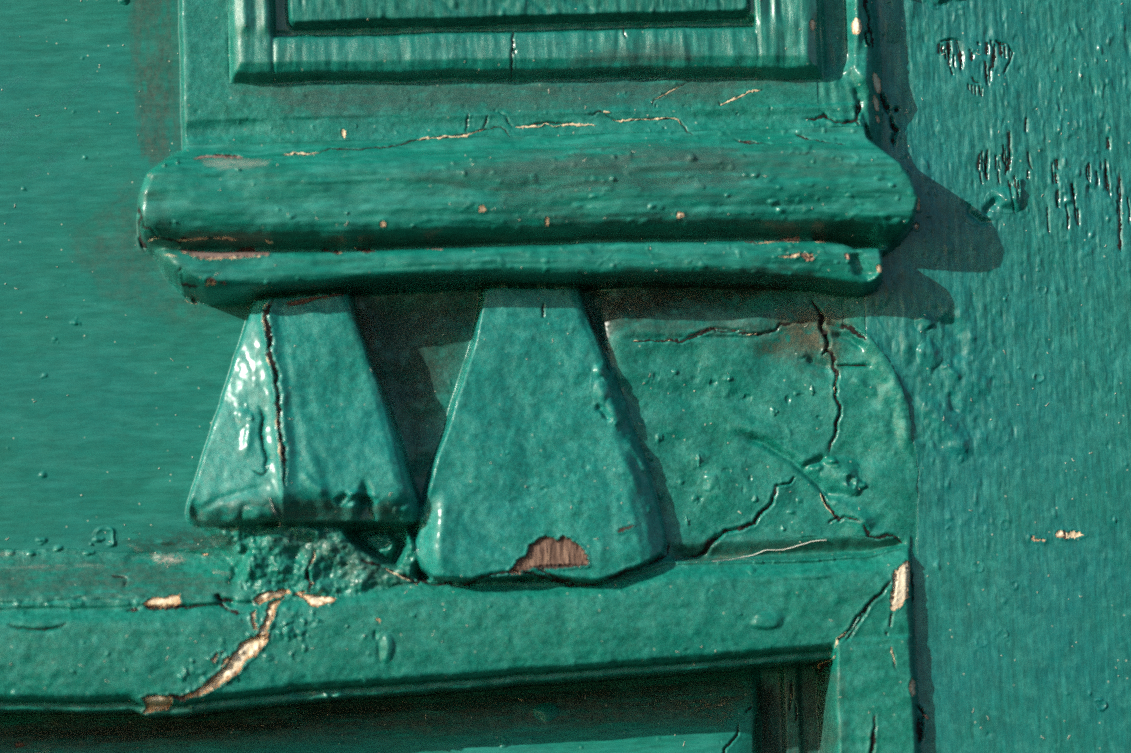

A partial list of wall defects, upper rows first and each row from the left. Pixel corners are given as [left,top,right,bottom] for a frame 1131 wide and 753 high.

crack [281,81,692,156]
crack [719,89,762,106]
crack [938,39,1013,97]
crack [977,119,1130,250]
crack [253,300,287,487]
crack [634,300,870,450]
peeling [509,536,589,575]
peeling [890,561,910,611]
peeling [142,589,336,714]